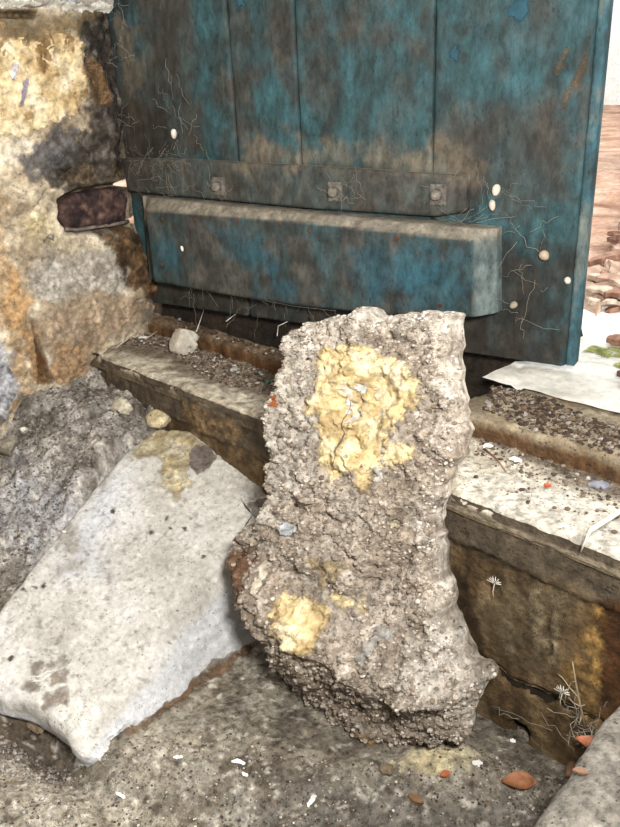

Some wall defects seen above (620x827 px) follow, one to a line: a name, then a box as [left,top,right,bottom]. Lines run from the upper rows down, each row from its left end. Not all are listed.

spalling [0,28,90,139]
water stain [0,10,126,197]
flaking render [0,341,20,421]
spalling [31,323,52,384]
crack [499,668,596,719]
corrosion [562,601,620,728]